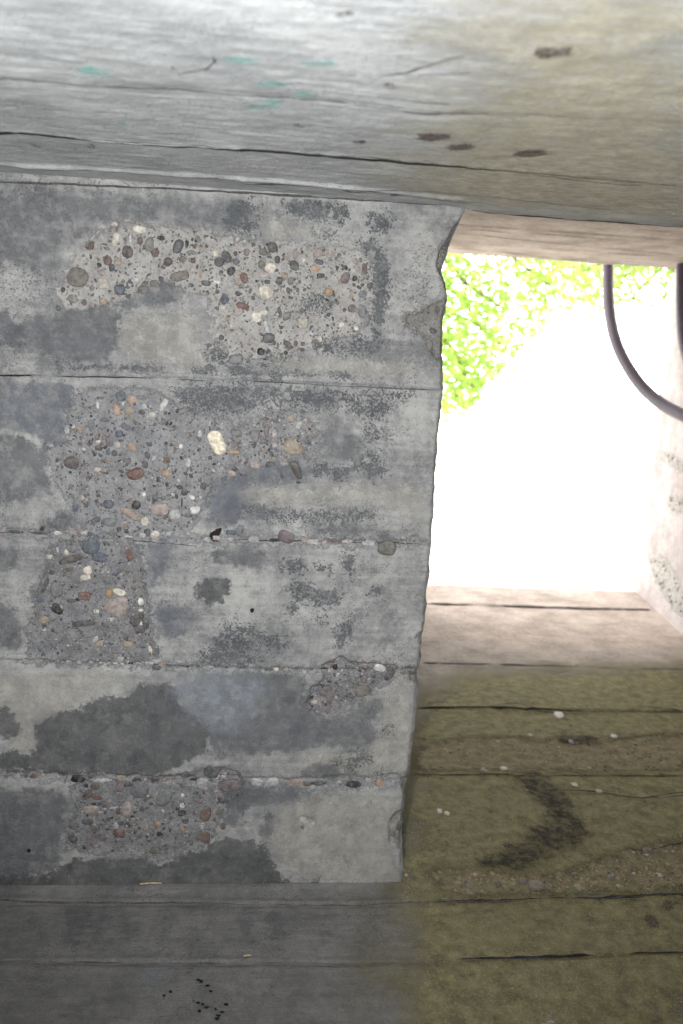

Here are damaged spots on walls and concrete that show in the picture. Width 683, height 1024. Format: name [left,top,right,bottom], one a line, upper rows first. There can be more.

crack [0,131,683,268]
spalling [23,195,420,670]
spalling [275,548,419,722]
leakage [0,673,379,776]
spalling [59,765,246,864]